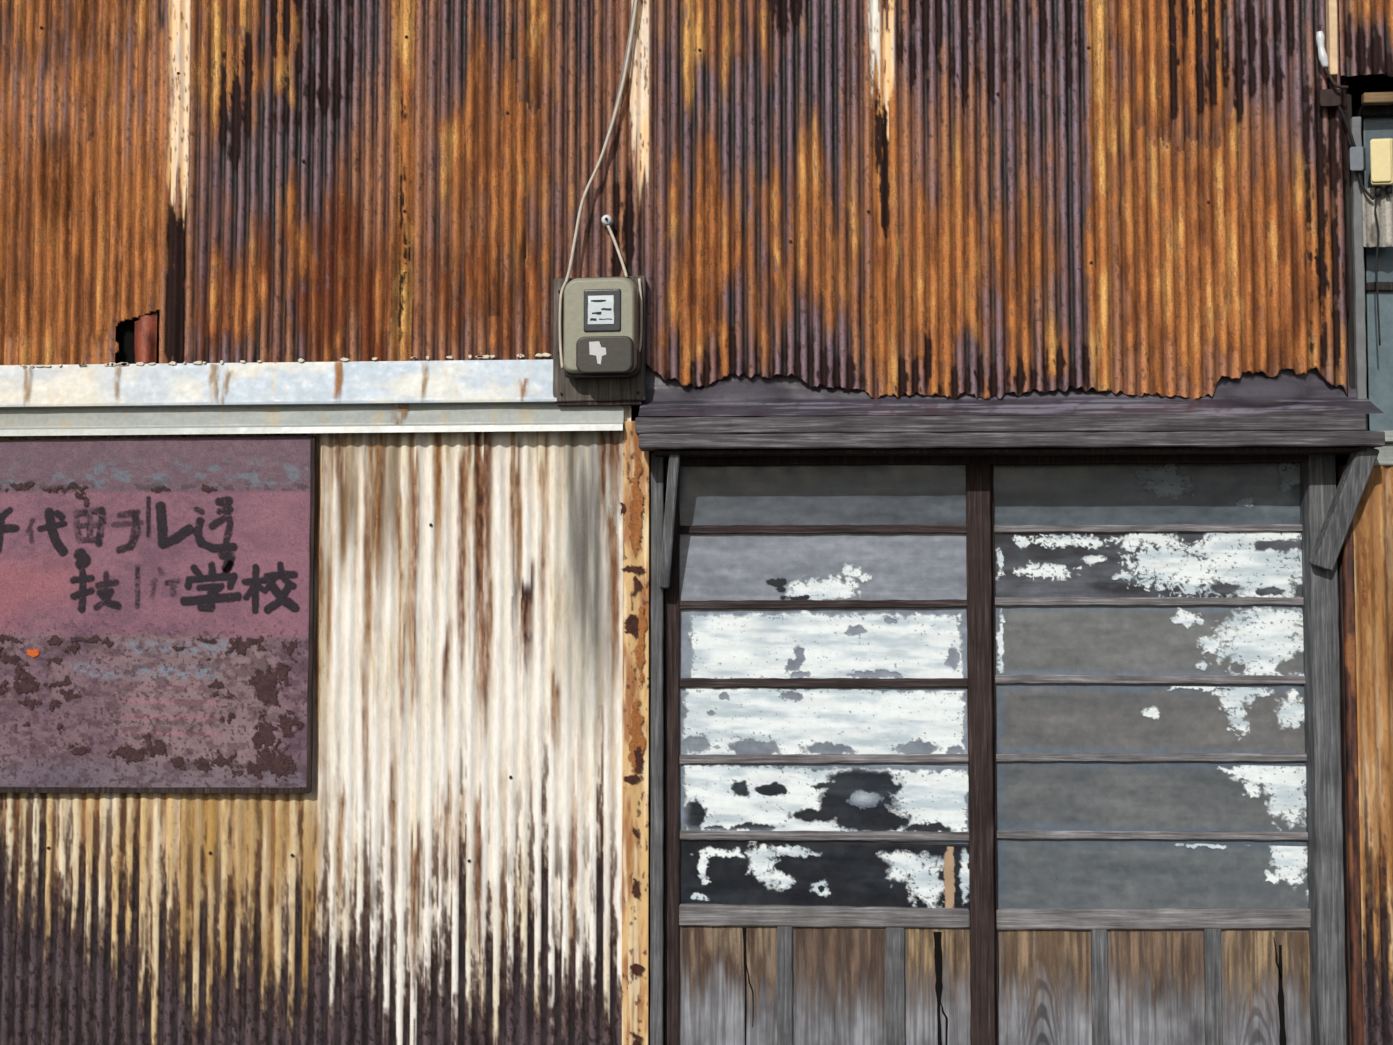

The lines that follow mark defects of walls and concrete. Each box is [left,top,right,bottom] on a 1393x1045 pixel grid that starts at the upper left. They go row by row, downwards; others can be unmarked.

rust [0,0,427,402]
rust [661,0,1393,398]
rust [0,754,645,1045]
leakage [374,438,398,534]
leakage [569,437,611,647]
rust [601,431,648,784]
peeling [682,564,969,908]
crack [933,932,948,1045]
peeling [995,532,1304,735]
peeling [1218,765,1306,827]
crack [1273,937,1286,1045]
peeling [1264,846,1308,895]